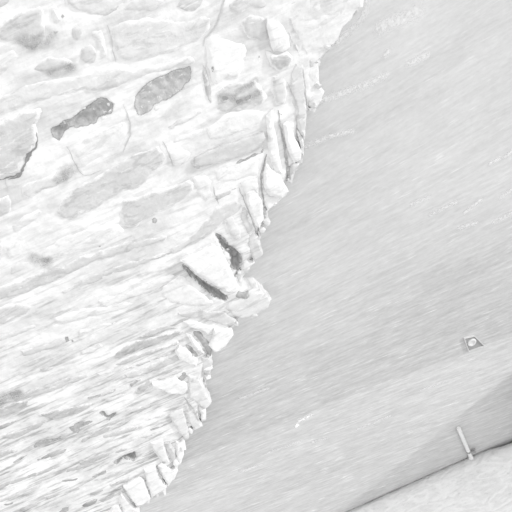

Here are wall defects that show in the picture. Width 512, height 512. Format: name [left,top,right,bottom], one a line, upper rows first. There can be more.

spalling [135,67,191,115]
spalling [51,98,113,140]
spalling [215,233,242,270]